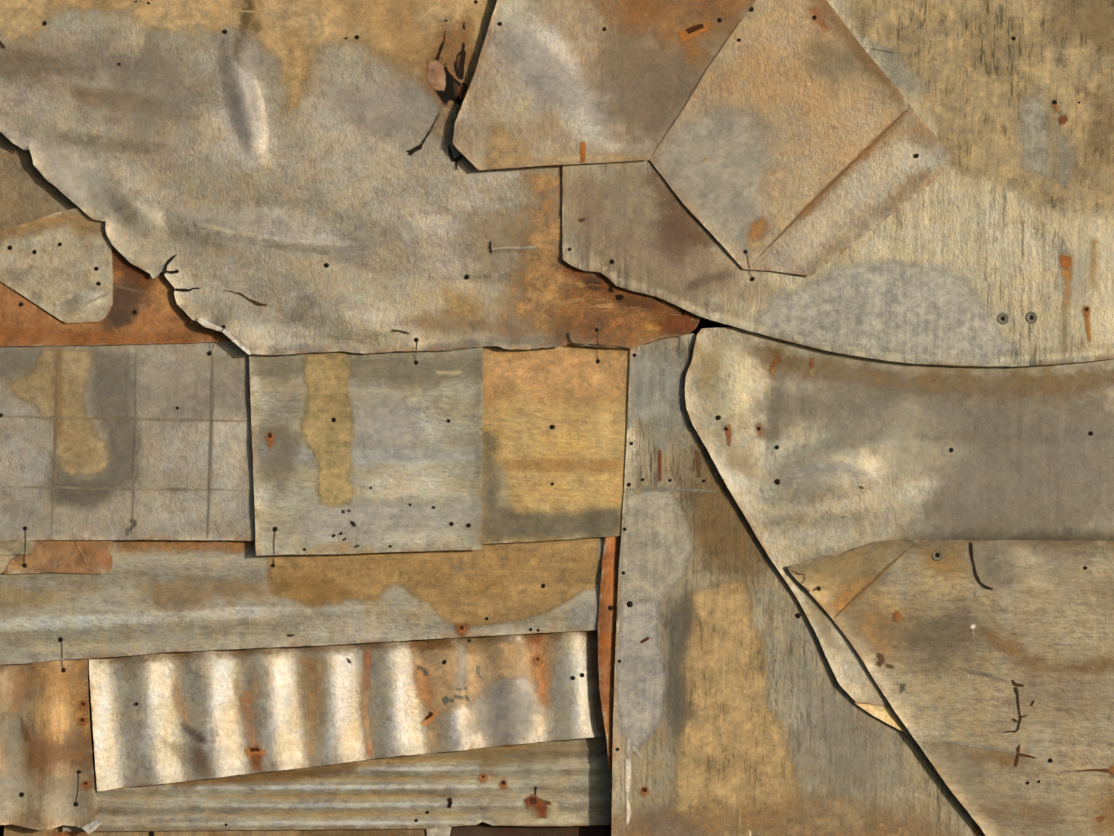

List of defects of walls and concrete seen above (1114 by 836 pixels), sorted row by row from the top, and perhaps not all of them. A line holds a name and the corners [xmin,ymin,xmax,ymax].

corrosion [600,0,753,63]
corrosion [116,255,152,289]
leakage [10,349,247,504]
leakage [151,351,692,759]
crack [970,542,993,590]
corrosion [184,680,355,786]
corrosion [300,624,561,755]
leakage [673,582,868,834]
crack [1002,680,1036,767]
leakage [492,810,531,824]
corrosion [524,795,558,821]
corrosion [627,800,945,836]